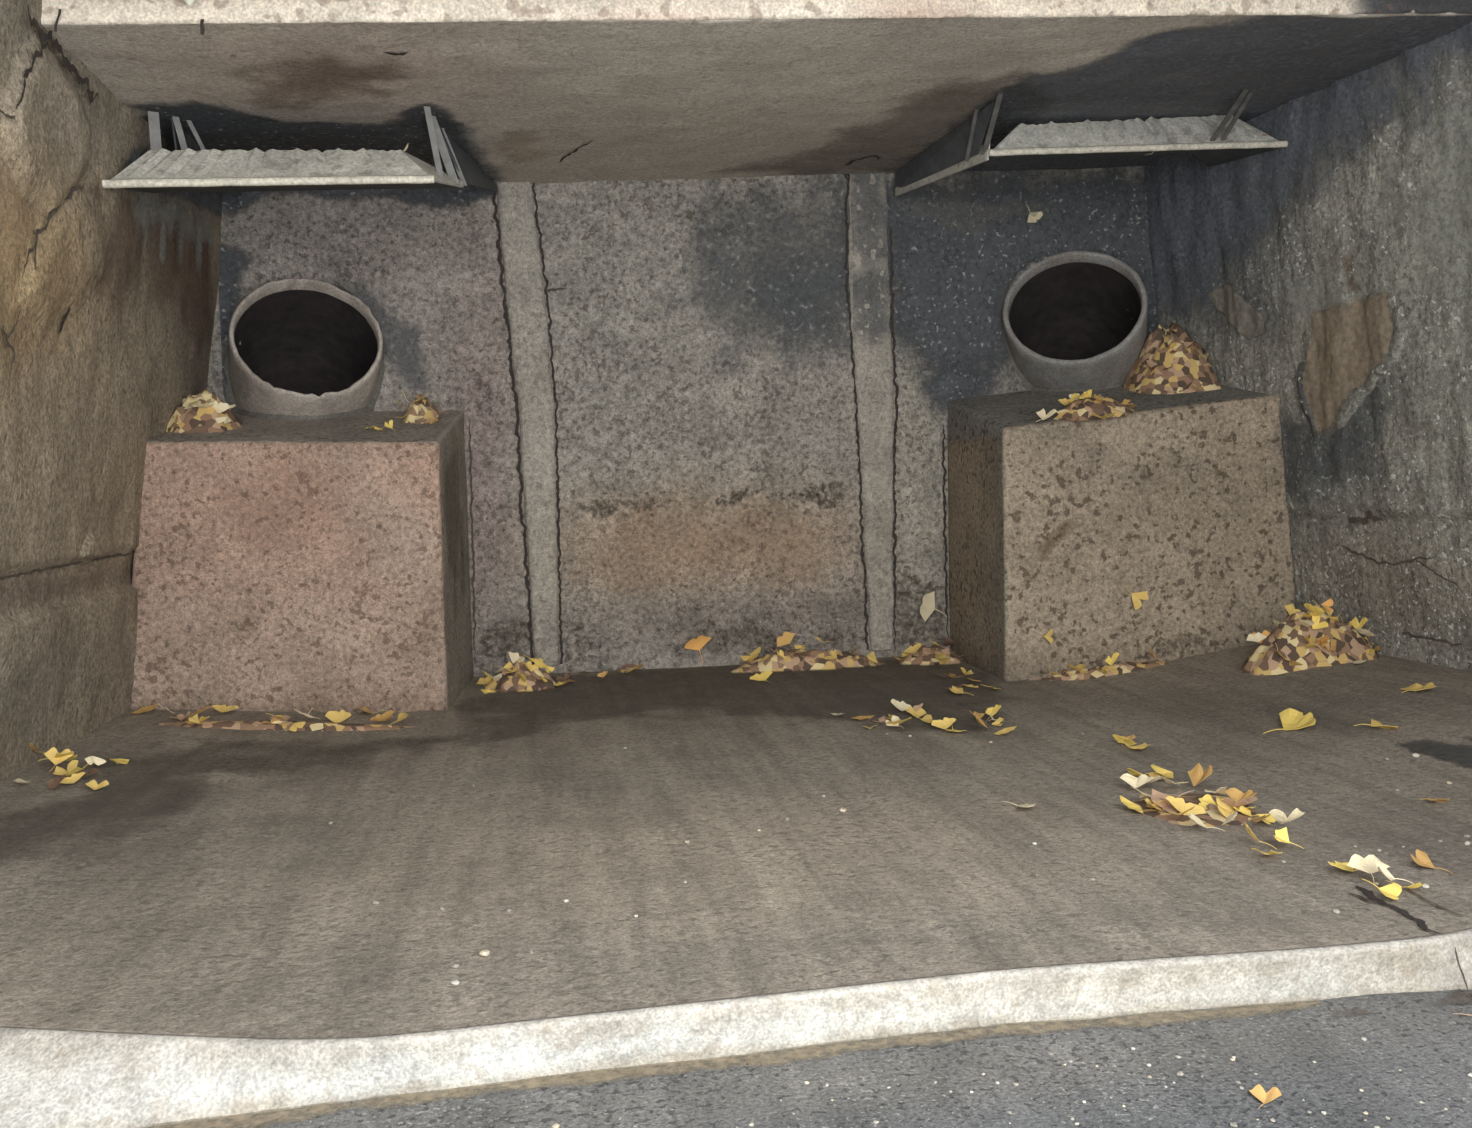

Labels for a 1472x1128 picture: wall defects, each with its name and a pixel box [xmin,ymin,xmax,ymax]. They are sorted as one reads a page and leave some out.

crack [0,6,98,119]
crack [3,183,85,369]
crack [492,141,592,665]
crack [844,155,899,650]
spalling [1297,262,1408,438]
crack [468,419,476,660]
crack [1341,511,1462,591]
crack [1402,632,1461,647]
damp [1402,738,1472,767]
crack [1349,885,1468,991]